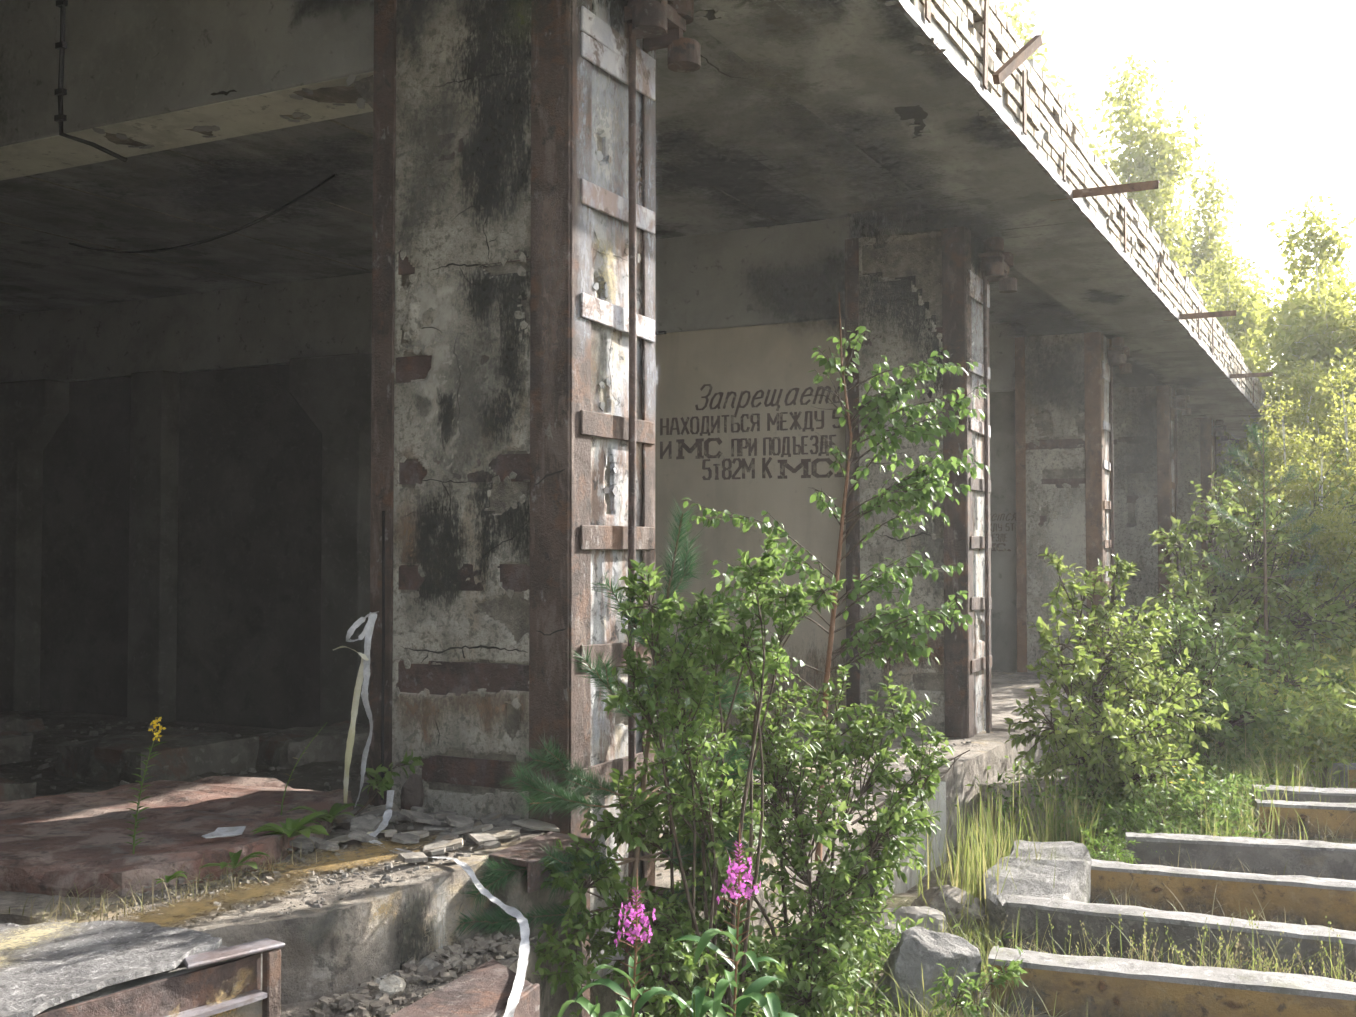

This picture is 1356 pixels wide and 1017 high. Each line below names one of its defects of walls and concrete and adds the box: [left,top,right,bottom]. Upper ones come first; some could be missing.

damp [403,0,531,252]
peeling [394,250,466,470]
damp [407,250,530,608]
spalling [488,472,530,513]
damp [370,892,444,967]